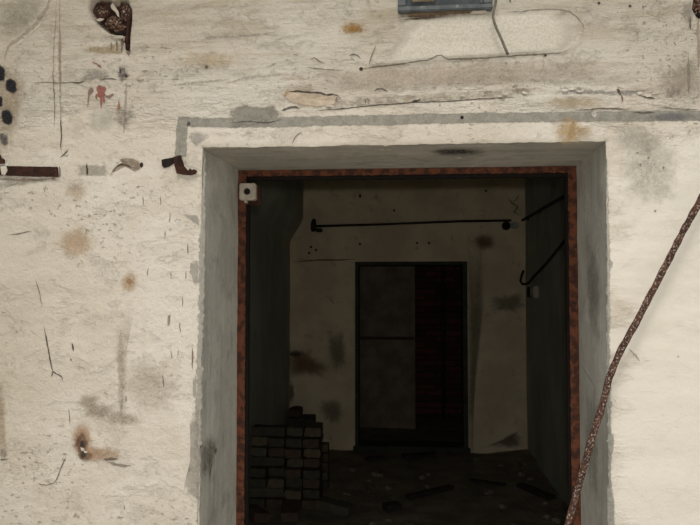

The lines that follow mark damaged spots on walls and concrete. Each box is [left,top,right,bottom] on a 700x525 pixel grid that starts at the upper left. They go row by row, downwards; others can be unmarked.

rust [343,23,363,34]
rust [90,39,131,56]
rust [0,155,61,181]
crack [44,329,63,380]
rust [74,428,131,467]